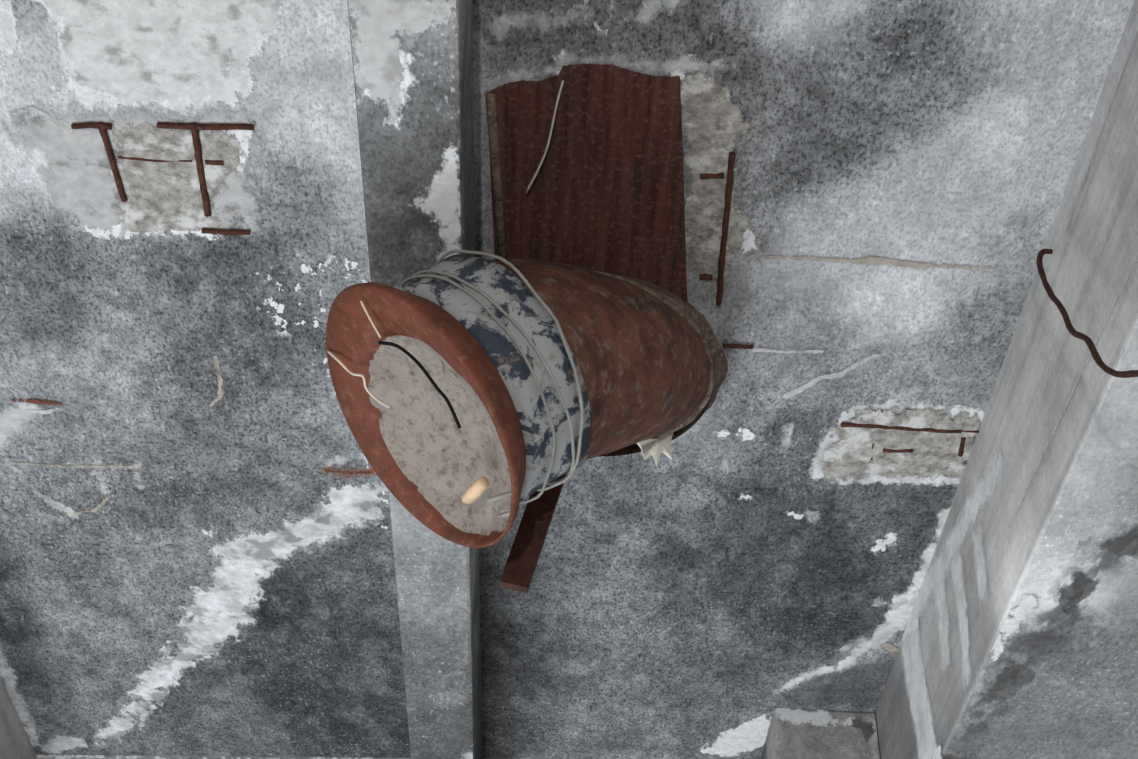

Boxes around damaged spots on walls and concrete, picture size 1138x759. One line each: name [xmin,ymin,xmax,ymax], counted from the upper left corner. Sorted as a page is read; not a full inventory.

flaking render [348,0,456,129]
damp [487,0,588,41]
damp [637,0,679,23]
spalling [0,0,285,244]
spalling [480,49,759,306]
damp [256,253,371,335]
spalling [810,399,985,487]
damp [0,651,207,759]
flaking render [700,713,772,757]